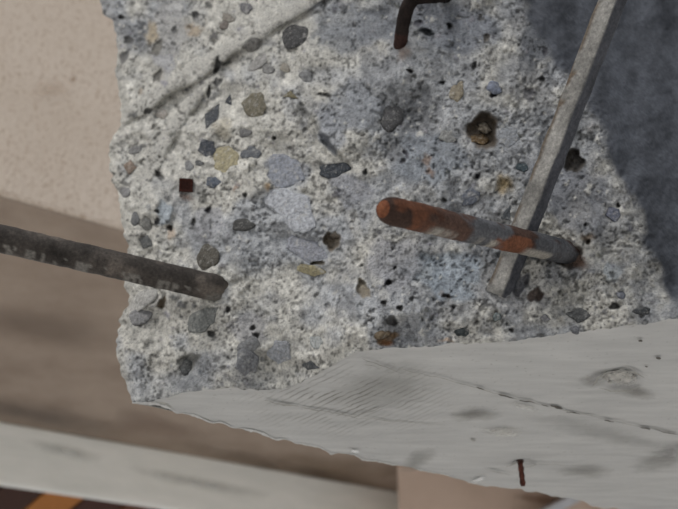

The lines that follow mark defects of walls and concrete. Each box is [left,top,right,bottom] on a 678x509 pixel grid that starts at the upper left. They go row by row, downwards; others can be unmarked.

spalling [100,0,678,412]
crack [362,358,674,434]